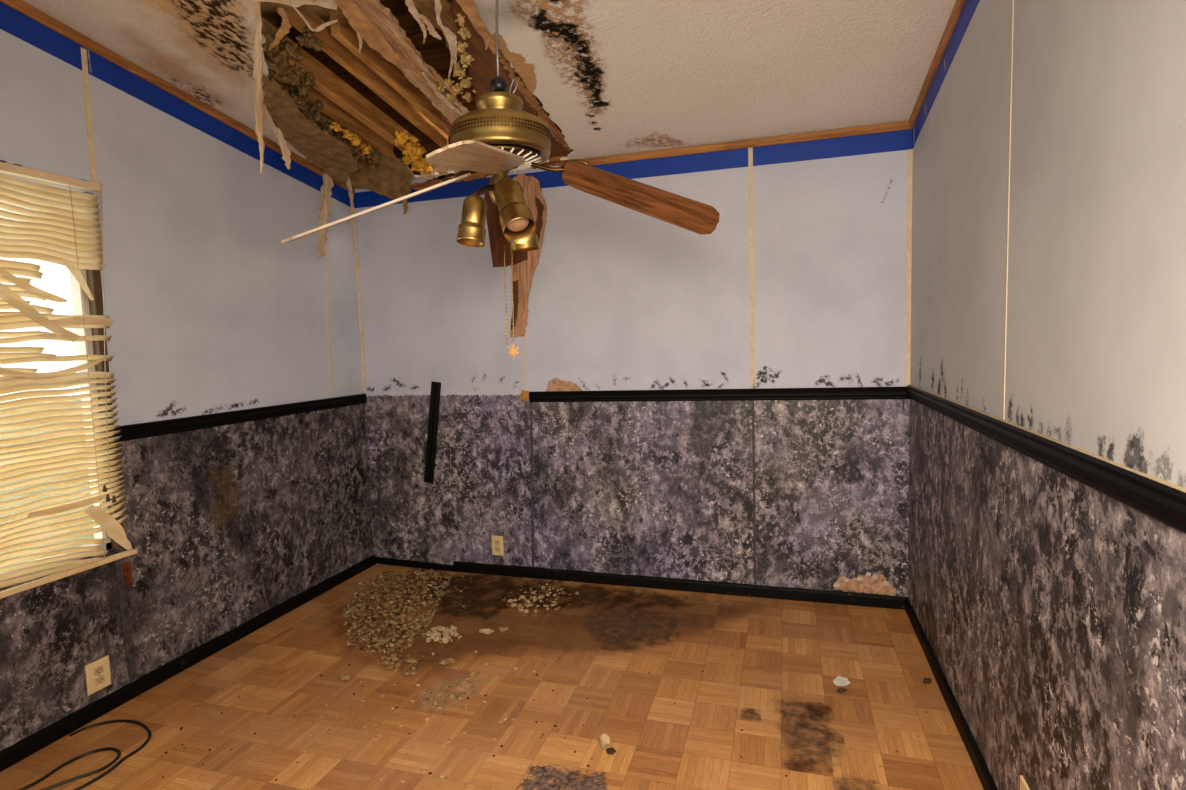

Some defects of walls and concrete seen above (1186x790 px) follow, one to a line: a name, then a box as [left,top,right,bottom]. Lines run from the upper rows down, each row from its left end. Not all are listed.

damp [149,0,251,73]
damp [512,0,609,131]
peeling [546,378,582,391]
damp [425,575,687,649]
spalling [833,572,896,595]
damp [781,703,831,771]